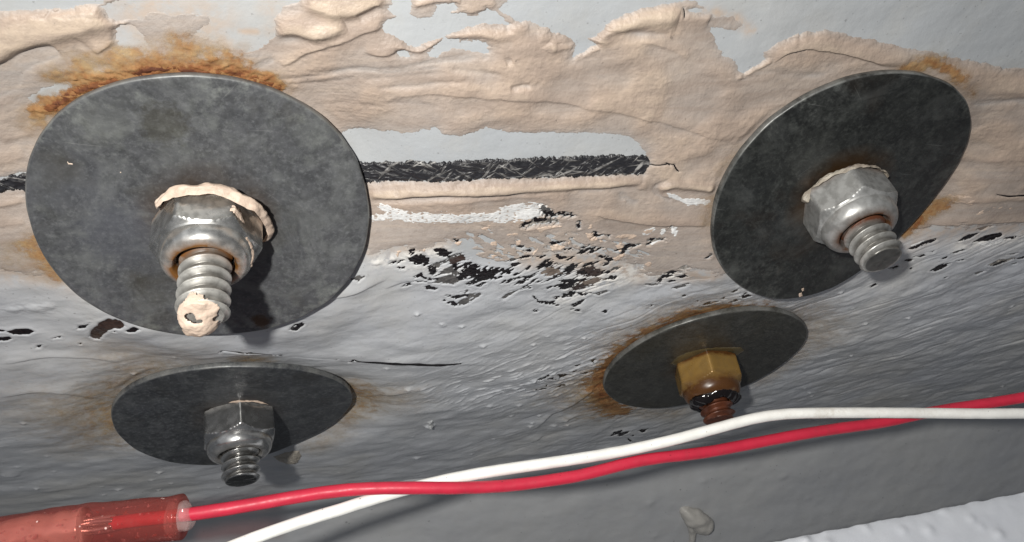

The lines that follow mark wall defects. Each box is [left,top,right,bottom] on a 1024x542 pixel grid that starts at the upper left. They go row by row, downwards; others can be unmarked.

corrosion [26,34,286,126]
corrosion [899,56,969,83]
peeling [667,193,711,206]
peeling [890,194,1016,278]
peeling [369,202,678,312]
peeling [975,253,1024,274]
peeling [645,265,751,305]
peeling [0,329,34,341]
peeling [78,319,139,344]
crack [335,359,462,367]
peeling [535,359,597,390]
corrosion [575,300,775,419]